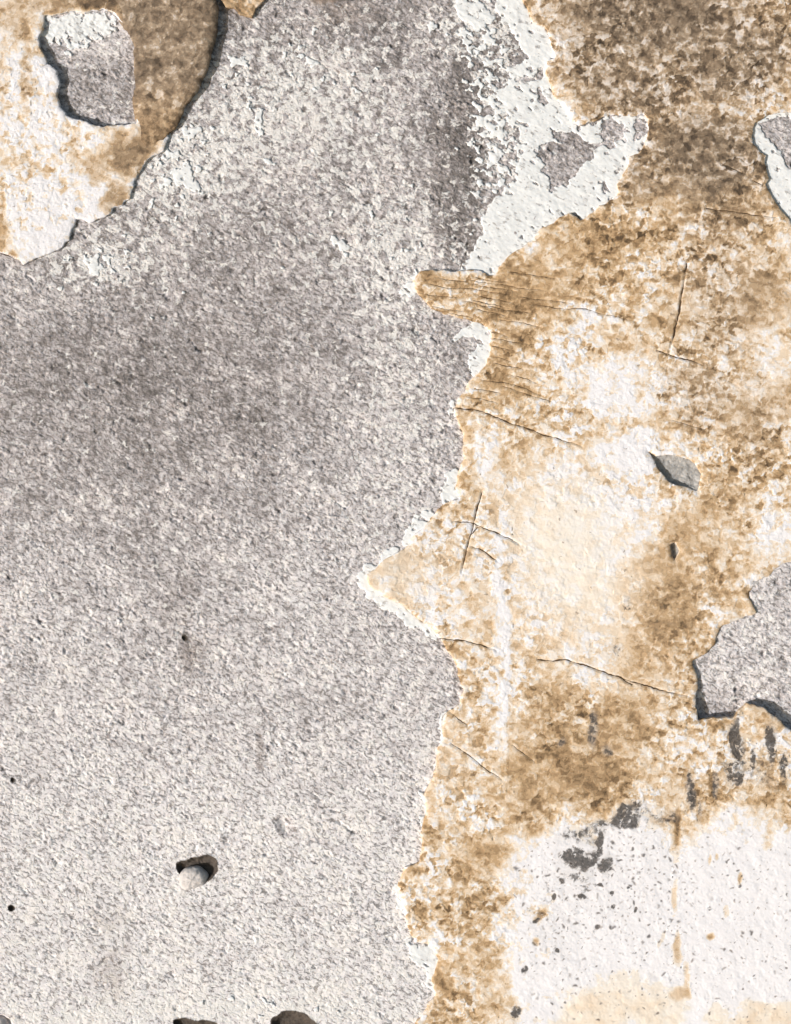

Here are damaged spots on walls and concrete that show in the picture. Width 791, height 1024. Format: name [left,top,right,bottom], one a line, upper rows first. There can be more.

leakage [0,0,123,138]
leakage [67,120,165,217]
flaking render [454,0,649,276]
flaking render [752,113,791,221]
crack [657,263,699,364]
crack [457,408,580,446]
leakage [406,0,791,910]
flaking render [0,0,491,1024]
crack [452,493,517,573]
crack [537,659,691,698]
spalling [692,562,791,729]
leakage [506,961,791,1024]